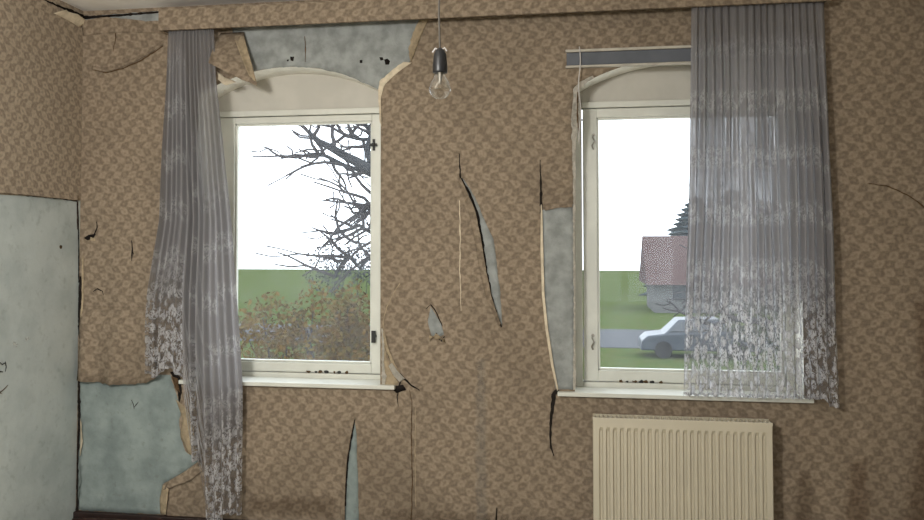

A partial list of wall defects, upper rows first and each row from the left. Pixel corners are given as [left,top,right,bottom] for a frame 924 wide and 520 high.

peeling [209,19,429,126]
peeling [77,306,204,515]
peeling [426,305,445,343]
peeling [540,76,594,456]